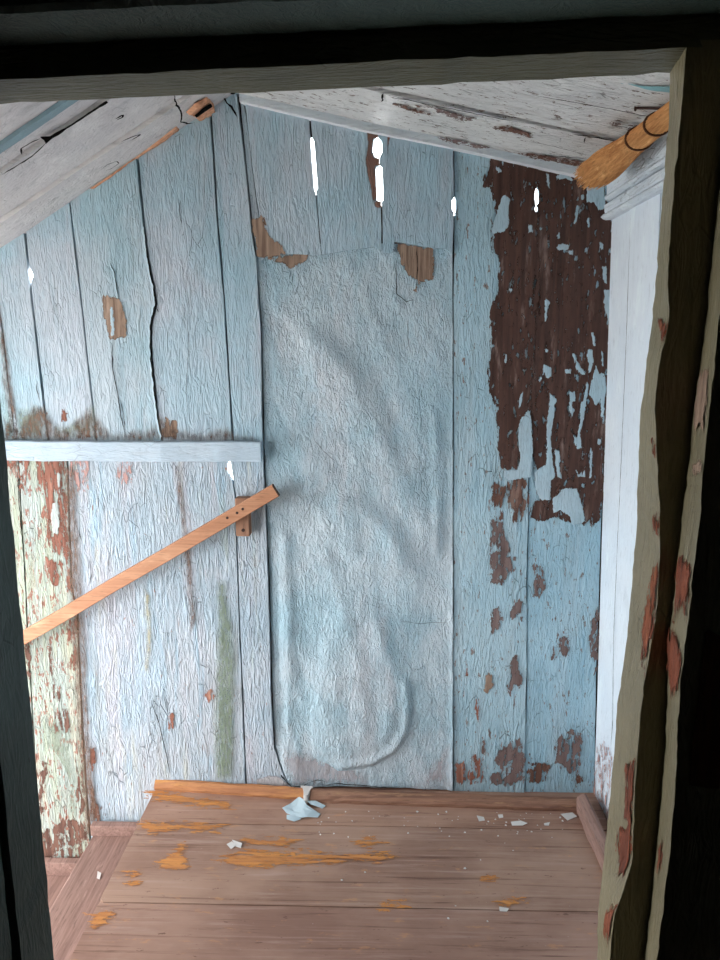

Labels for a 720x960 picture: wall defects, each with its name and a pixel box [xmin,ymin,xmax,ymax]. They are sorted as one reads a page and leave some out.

crack [5,101,141,173]
peeling [251,215,308,269]
water stain [0,318,195,440]
peeling [102,295,127,340]
crack [142,227,162,437]
peeling [438,137,612,585]
peeling [7,460,89,592]
peeling [490,563,547,634]
peeling [589,607,600,676]
peeling [666,555,692,699]
peeling [42,747,107,858]
peeling [453,729,612,820]